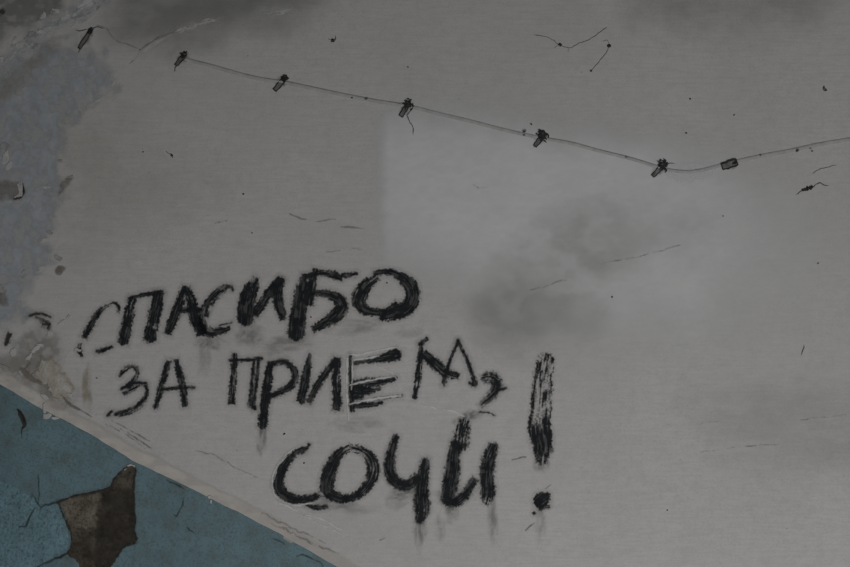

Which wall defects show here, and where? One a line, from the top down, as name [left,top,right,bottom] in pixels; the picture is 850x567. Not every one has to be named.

flaking render [55,464,138,567]